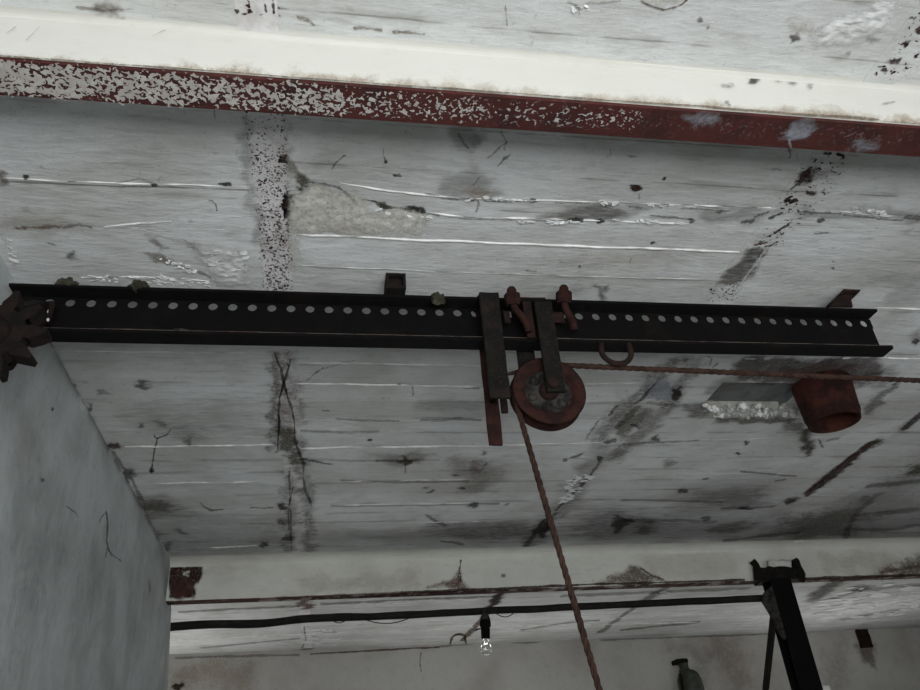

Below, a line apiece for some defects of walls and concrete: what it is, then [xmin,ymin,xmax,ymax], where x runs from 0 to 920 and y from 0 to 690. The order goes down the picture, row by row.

peeling [0,59,641,291]
water stain [710,248,766,302]
spalling [687,400,799,424]
crack [149,430,171,473]
crack [250,353,332,549]
rust [805,557,920,602]
rust [169,560,745,655]